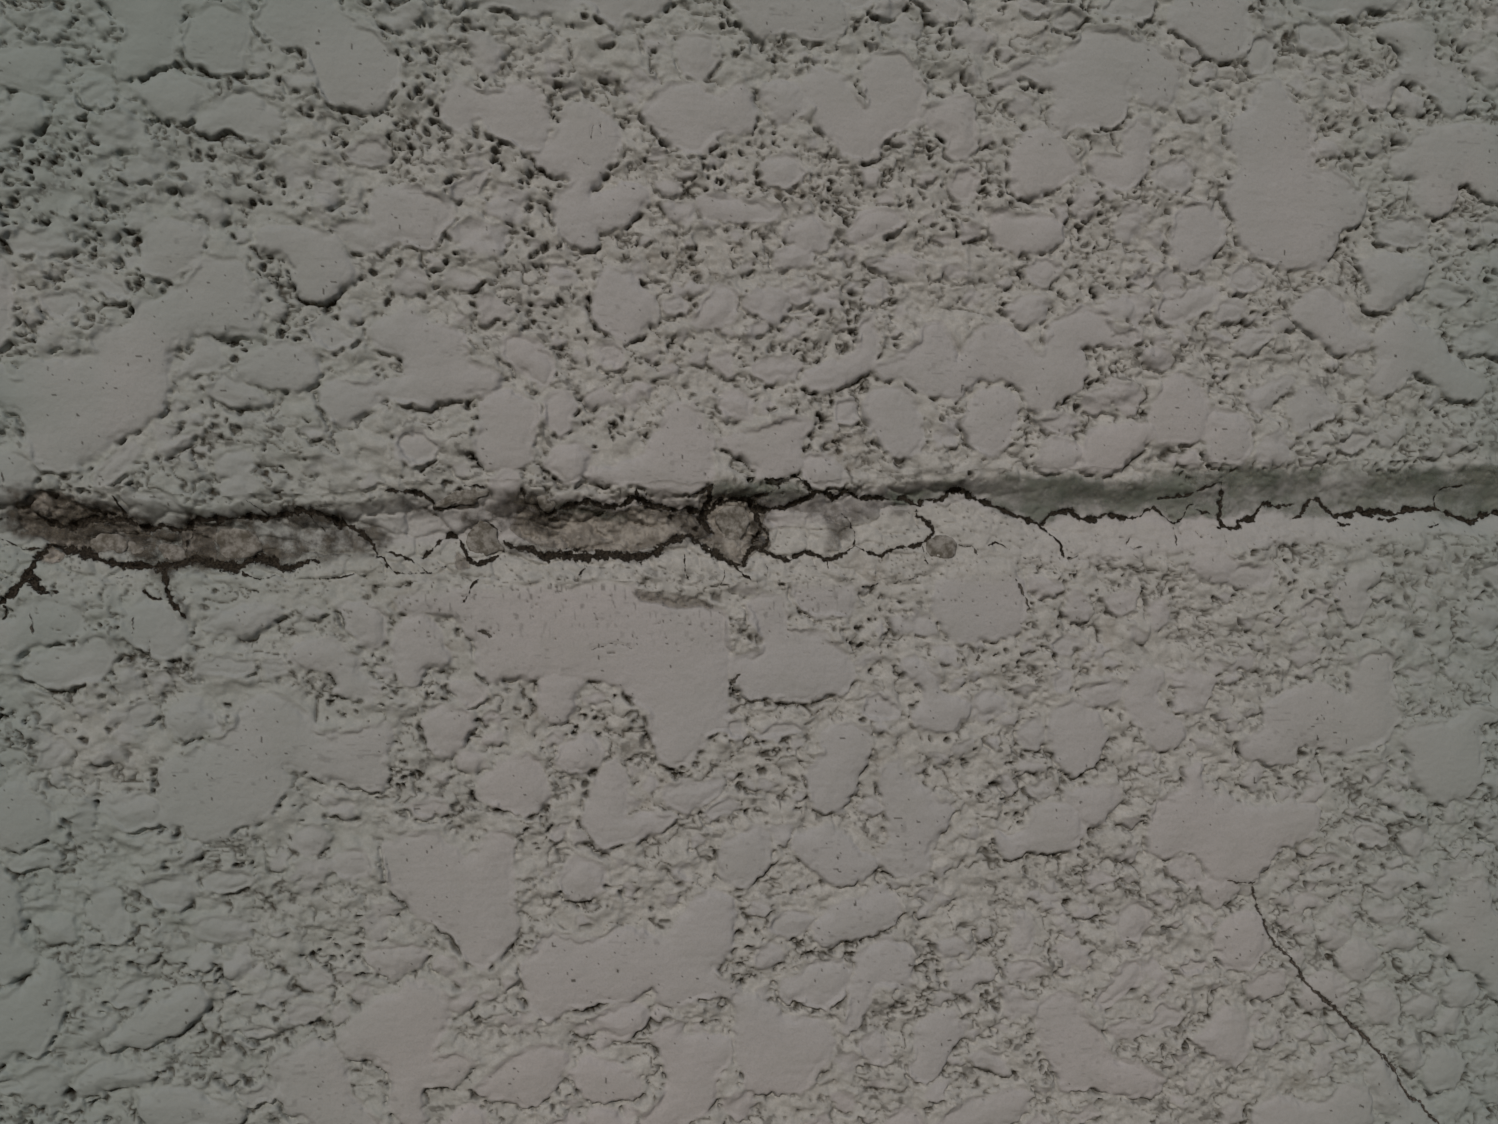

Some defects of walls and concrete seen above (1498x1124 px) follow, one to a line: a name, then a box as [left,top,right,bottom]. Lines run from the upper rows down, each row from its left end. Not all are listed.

spalling [17,490,262,564]
spalling [434,488,770,568]
crack [0,474,1498,653]
crack [1227,864,1440,1124]